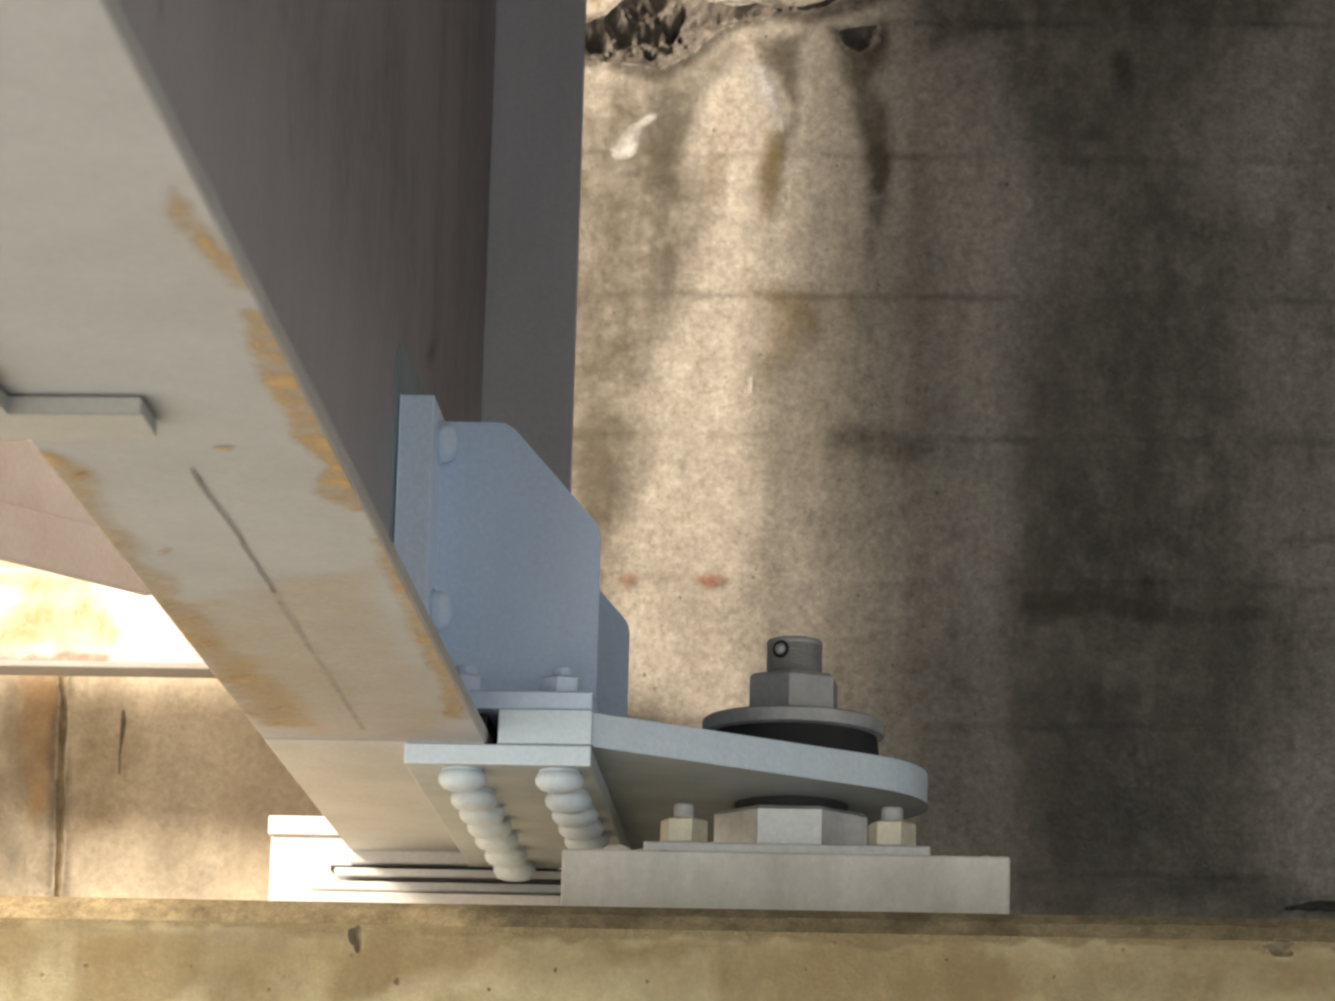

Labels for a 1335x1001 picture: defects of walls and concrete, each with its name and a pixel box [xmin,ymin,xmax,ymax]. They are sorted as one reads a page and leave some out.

spalling [585,0,778,78]
damp [754,40,794,130]
spalling [836,25,884,58]
damp [842,44,887,218]
damp [575,88,688,385]
corrosion [246,313,364,511]
damp [572,399,627,532]
corrosion [165,603,216,648]
damp [0,917,1266,953]